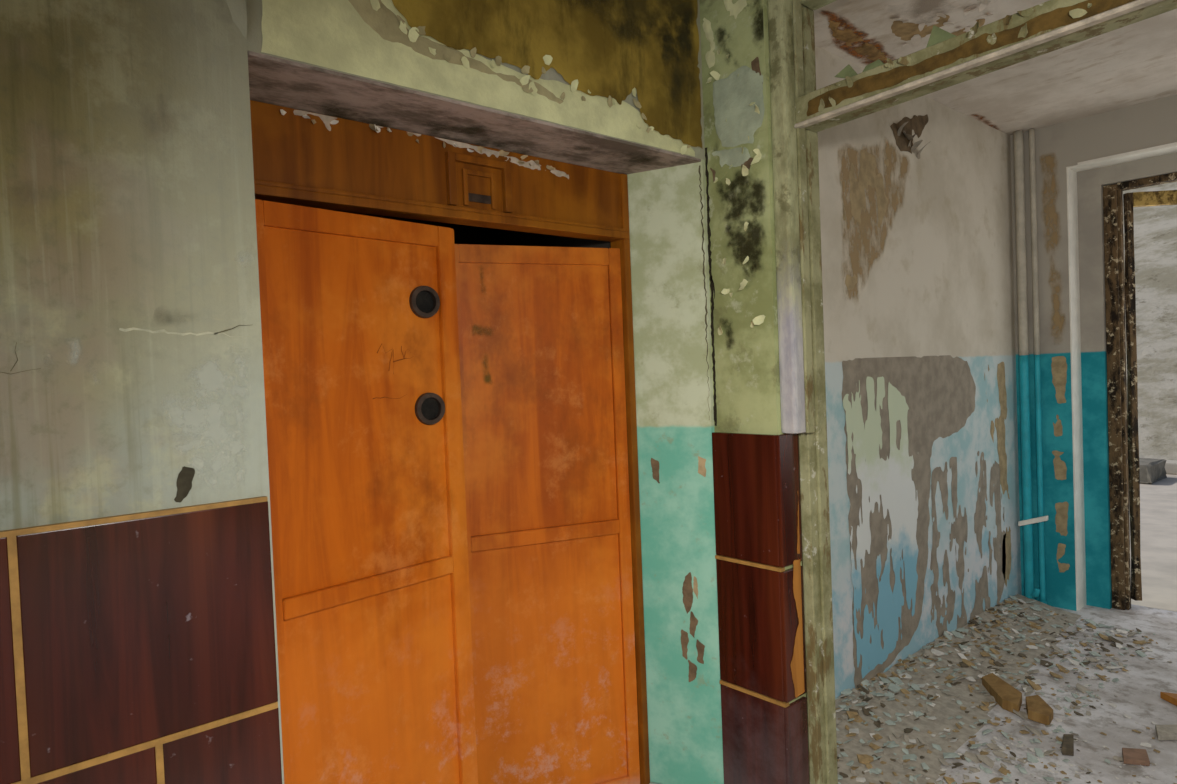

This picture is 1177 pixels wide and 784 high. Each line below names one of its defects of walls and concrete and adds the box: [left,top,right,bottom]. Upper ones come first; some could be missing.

peeling [261,0,765,185]
water stain [611,0,693,96]
water stain [754,0,764,40]
peeling [807,0,1135,116]
water stain [719,173,764,273]
peeling [840,115,929,298]
crack [119,325,250,337]
peeling [1051,356,1067,437]
peeling [1052,451,1067,480]
peeling [842,355,1011,688]
peeling [1055,502,1070,572]
peeling [681,572,705,682]